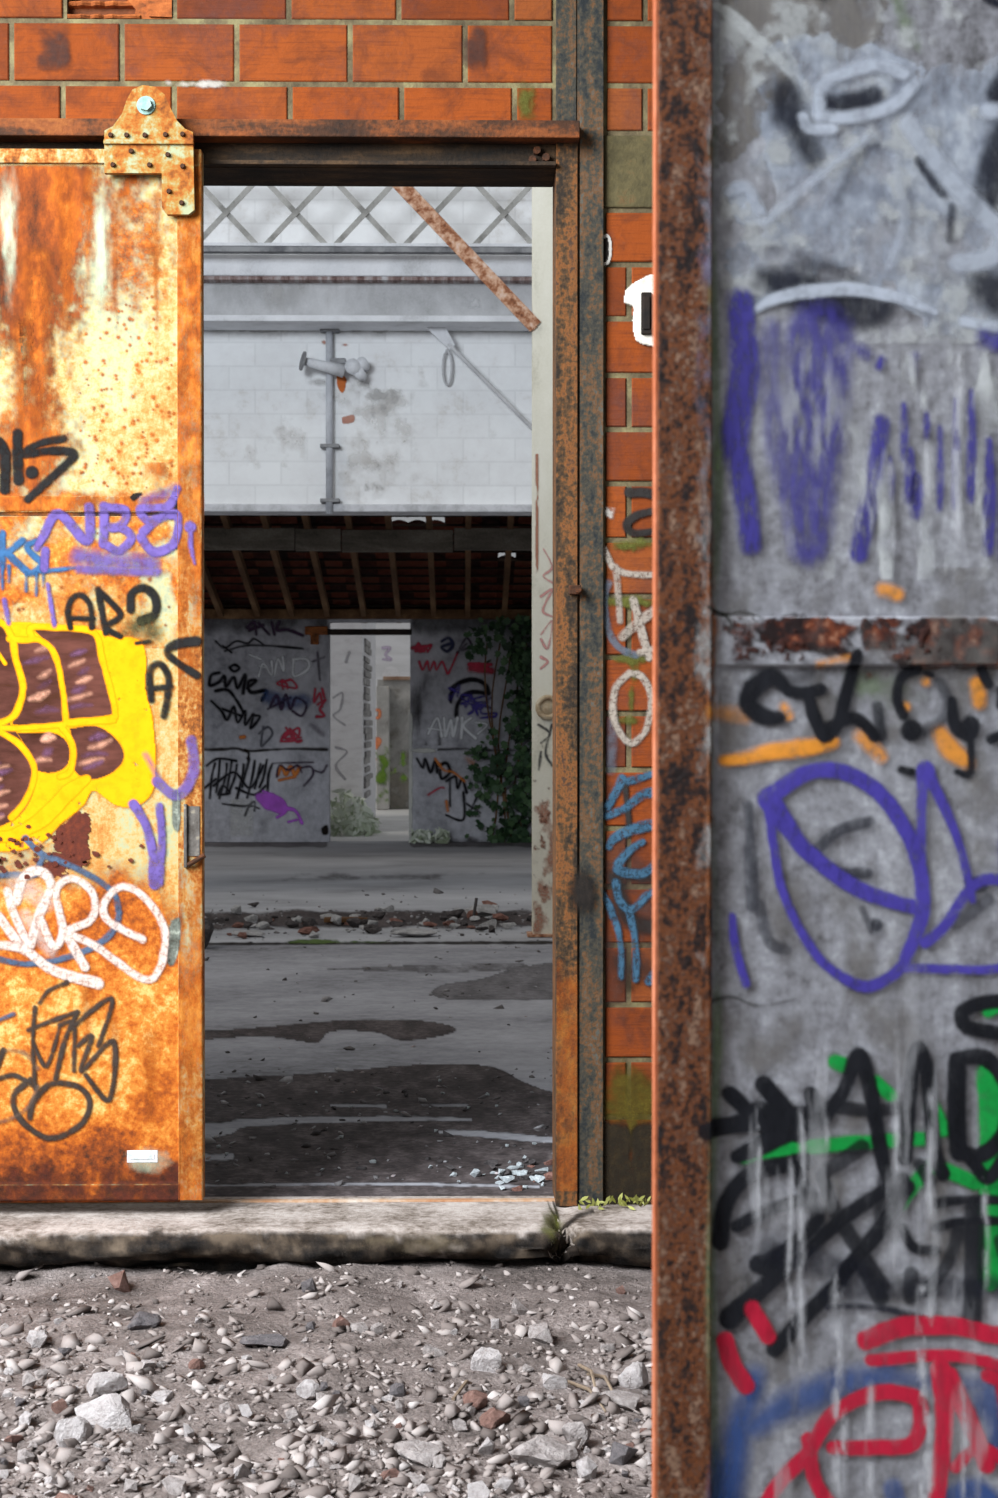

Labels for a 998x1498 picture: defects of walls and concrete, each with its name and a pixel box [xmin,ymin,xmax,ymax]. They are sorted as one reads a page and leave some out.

corrosion [0,165,205,648]
corrosion [706,531,998,776]
corrosion [0,842,203,1203]